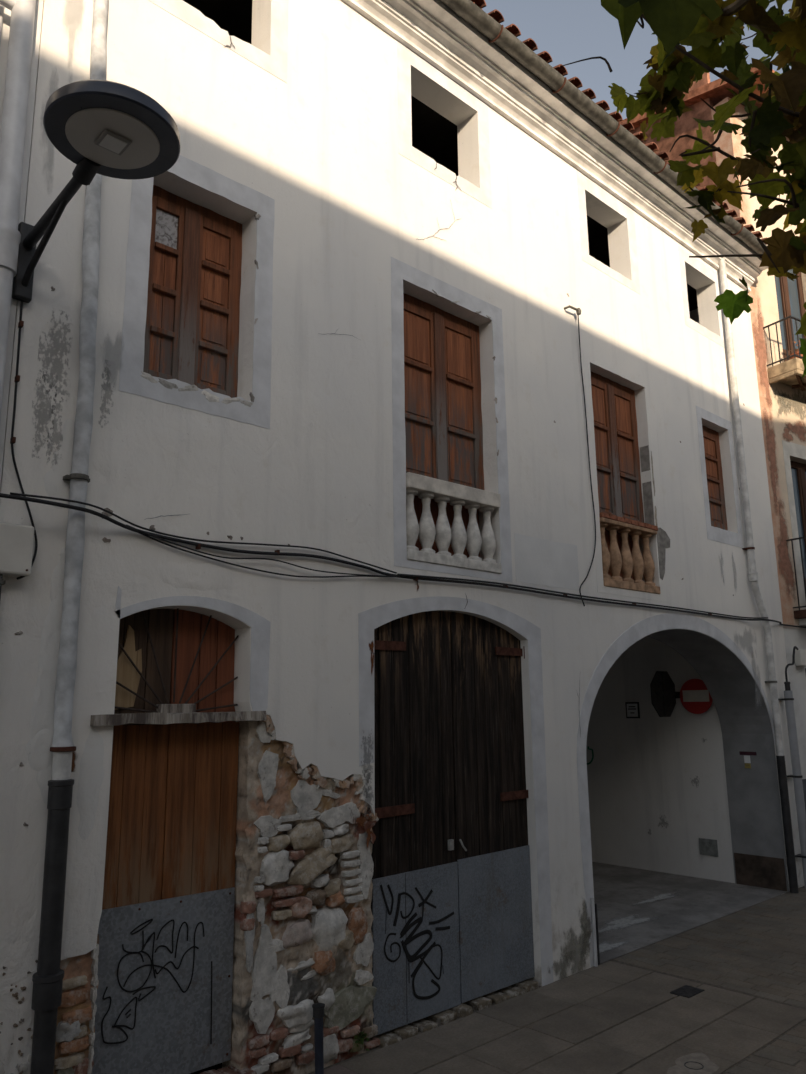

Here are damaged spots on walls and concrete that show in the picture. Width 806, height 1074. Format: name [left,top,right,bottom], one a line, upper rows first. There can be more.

crack [418,162,462,240]
peeling [754,305,806,593]
peeling [3,960,38,1004]
spalling [54,934,99,1074]
spalling [222,715,380,1074]
water stain [549,901,591,979]